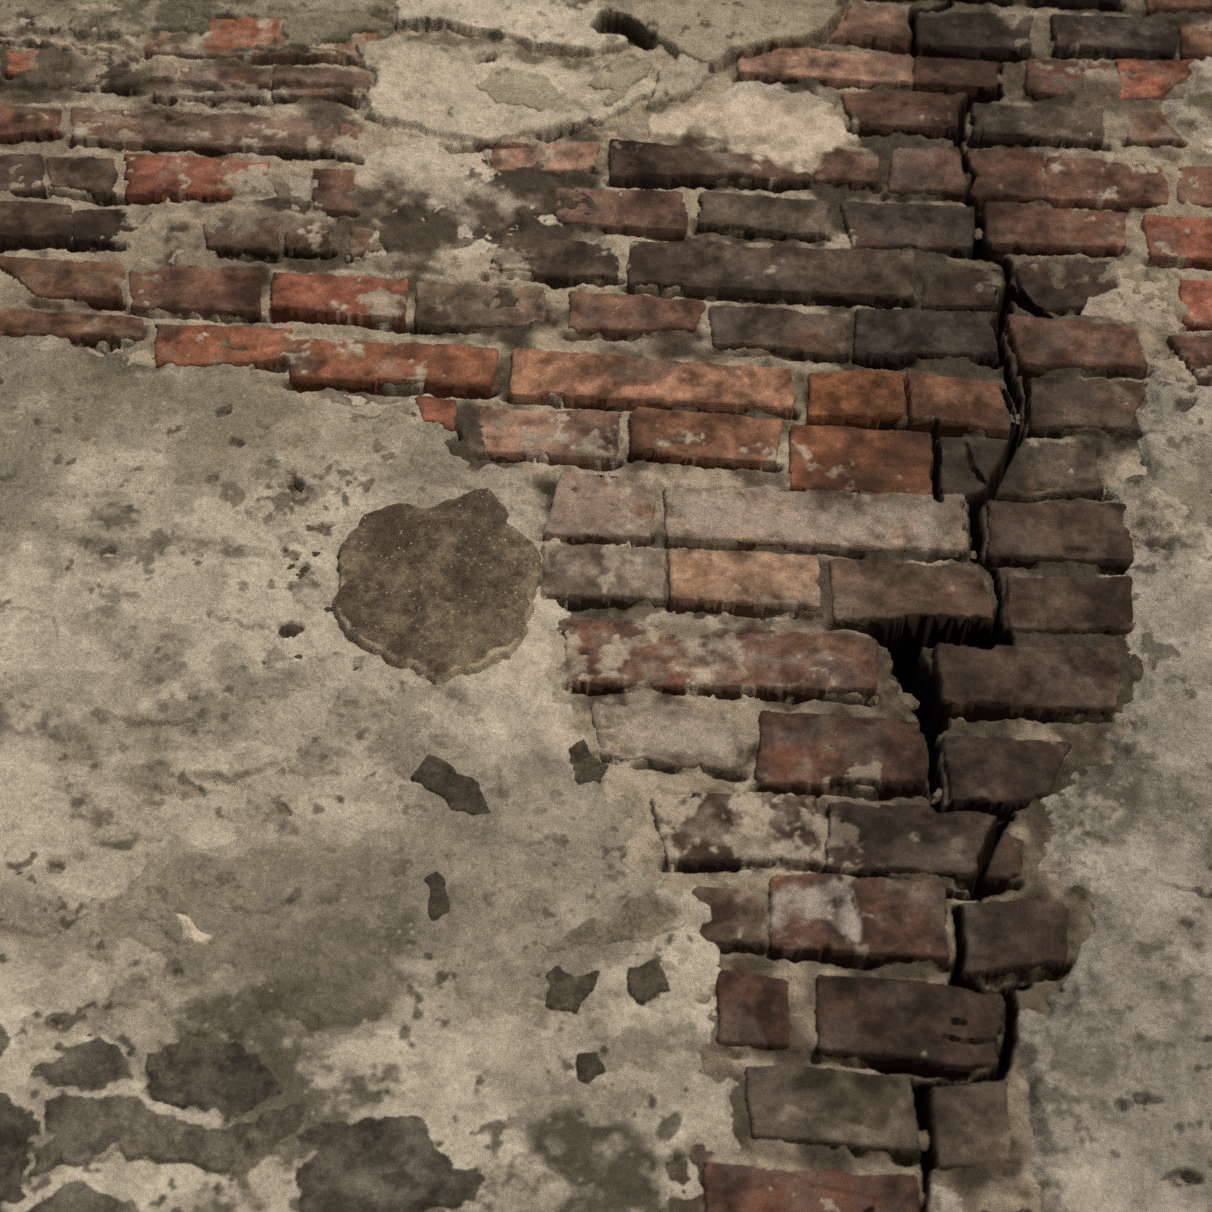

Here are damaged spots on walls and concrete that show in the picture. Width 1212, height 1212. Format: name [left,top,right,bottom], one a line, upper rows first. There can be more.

flaking render [354,0,710,142]
peeling [331,488,543,685]
crack [859,0,1053,1212]
flaking render [410,754,491,816]
flaking render [569,739,609,785]
flaking render [423,871,450,921]
crack [1160,881,1212,900]
flaking render [173,914,212,947]
flaking render [541,889,688,1014]
spalling [0,1023,10,1057]
flaking render [575,1052,606,1084]
spalling [0,1034,500,1212]